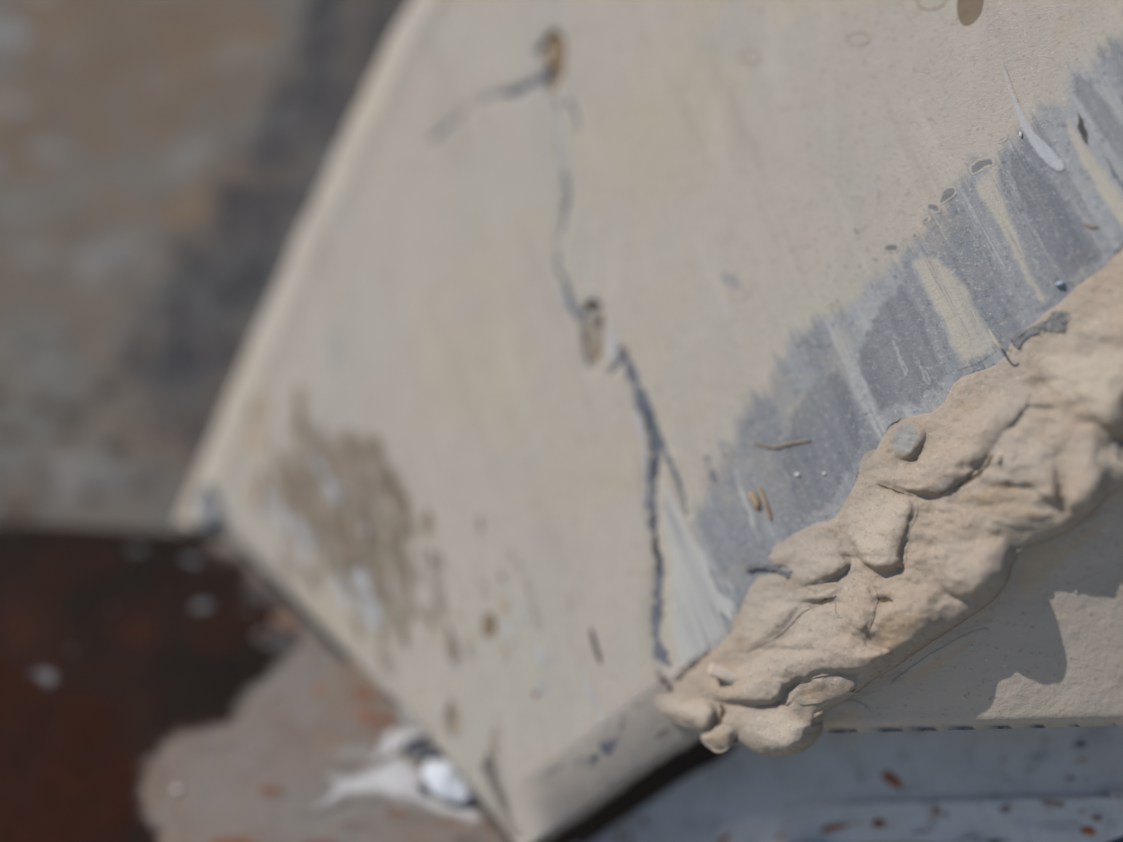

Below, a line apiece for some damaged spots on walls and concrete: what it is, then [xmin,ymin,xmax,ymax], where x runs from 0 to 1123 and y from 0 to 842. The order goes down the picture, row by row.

spalling [999,59,1066,172]
crack [605,325,698,692]